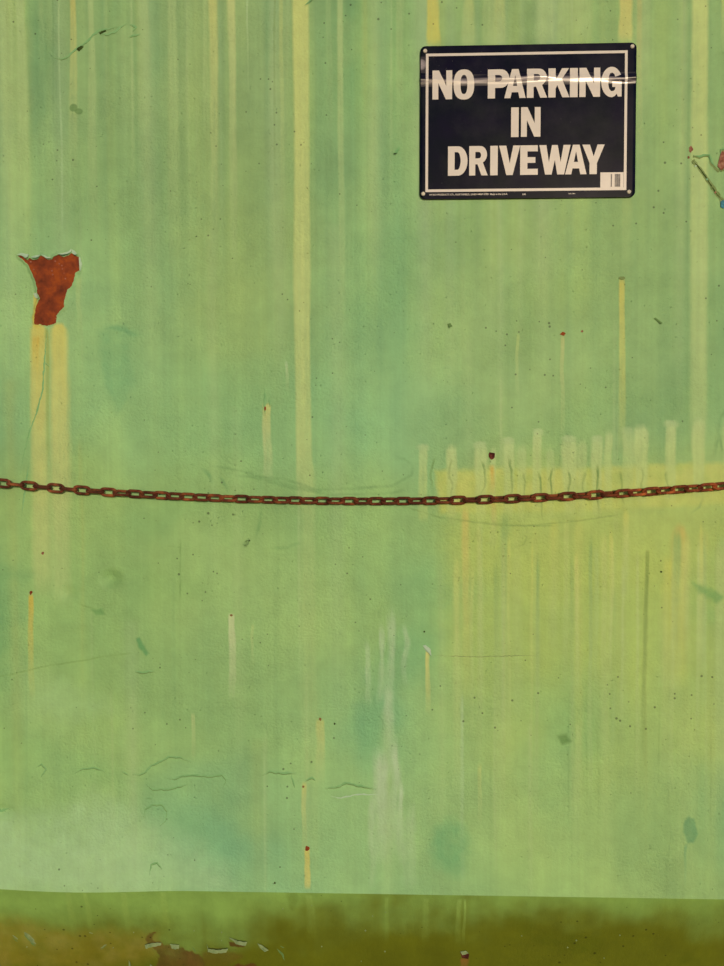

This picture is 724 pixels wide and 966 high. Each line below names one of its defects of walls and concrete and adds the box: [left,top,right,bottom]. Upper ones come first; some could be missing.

crack [55,24,139,60]
peeling [687,146,724,209]
peeling [15,249,84,327]
crack [20,334,49,511]
damp [414,416,724,899]
crack [75,756,226,791]
crack [264,771,376,789]